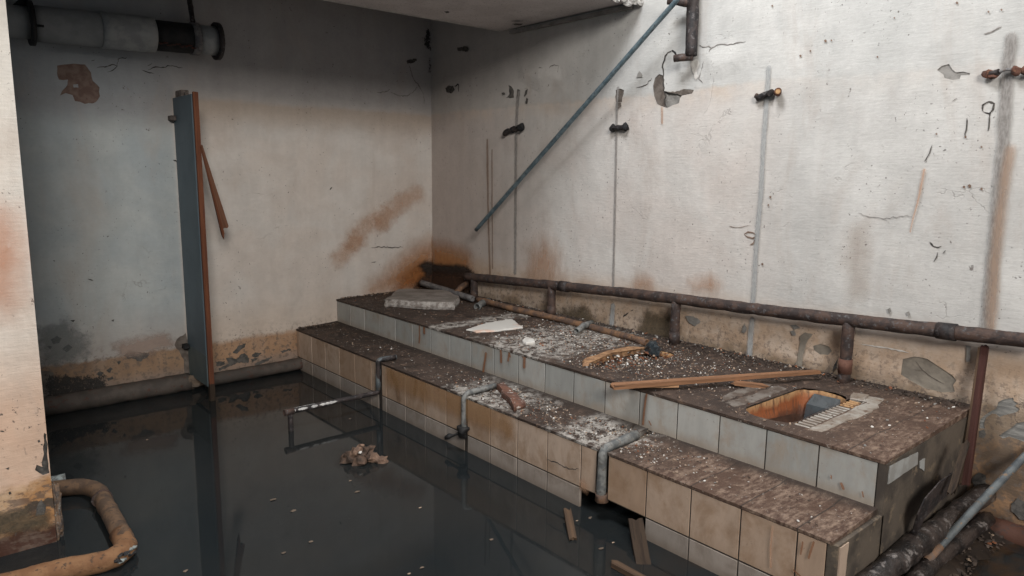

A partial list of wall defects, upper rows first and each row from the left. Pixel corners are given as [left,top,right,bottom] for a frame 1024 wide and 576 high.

peeling [57,64,100,104]
spalling [653,74,694,108]
crack [698,41,745,83]
spalling [938,64,970,80]
peeling [216,343,291,371]
water stain [43,372,107,396]
spalling [901,357,956,392]